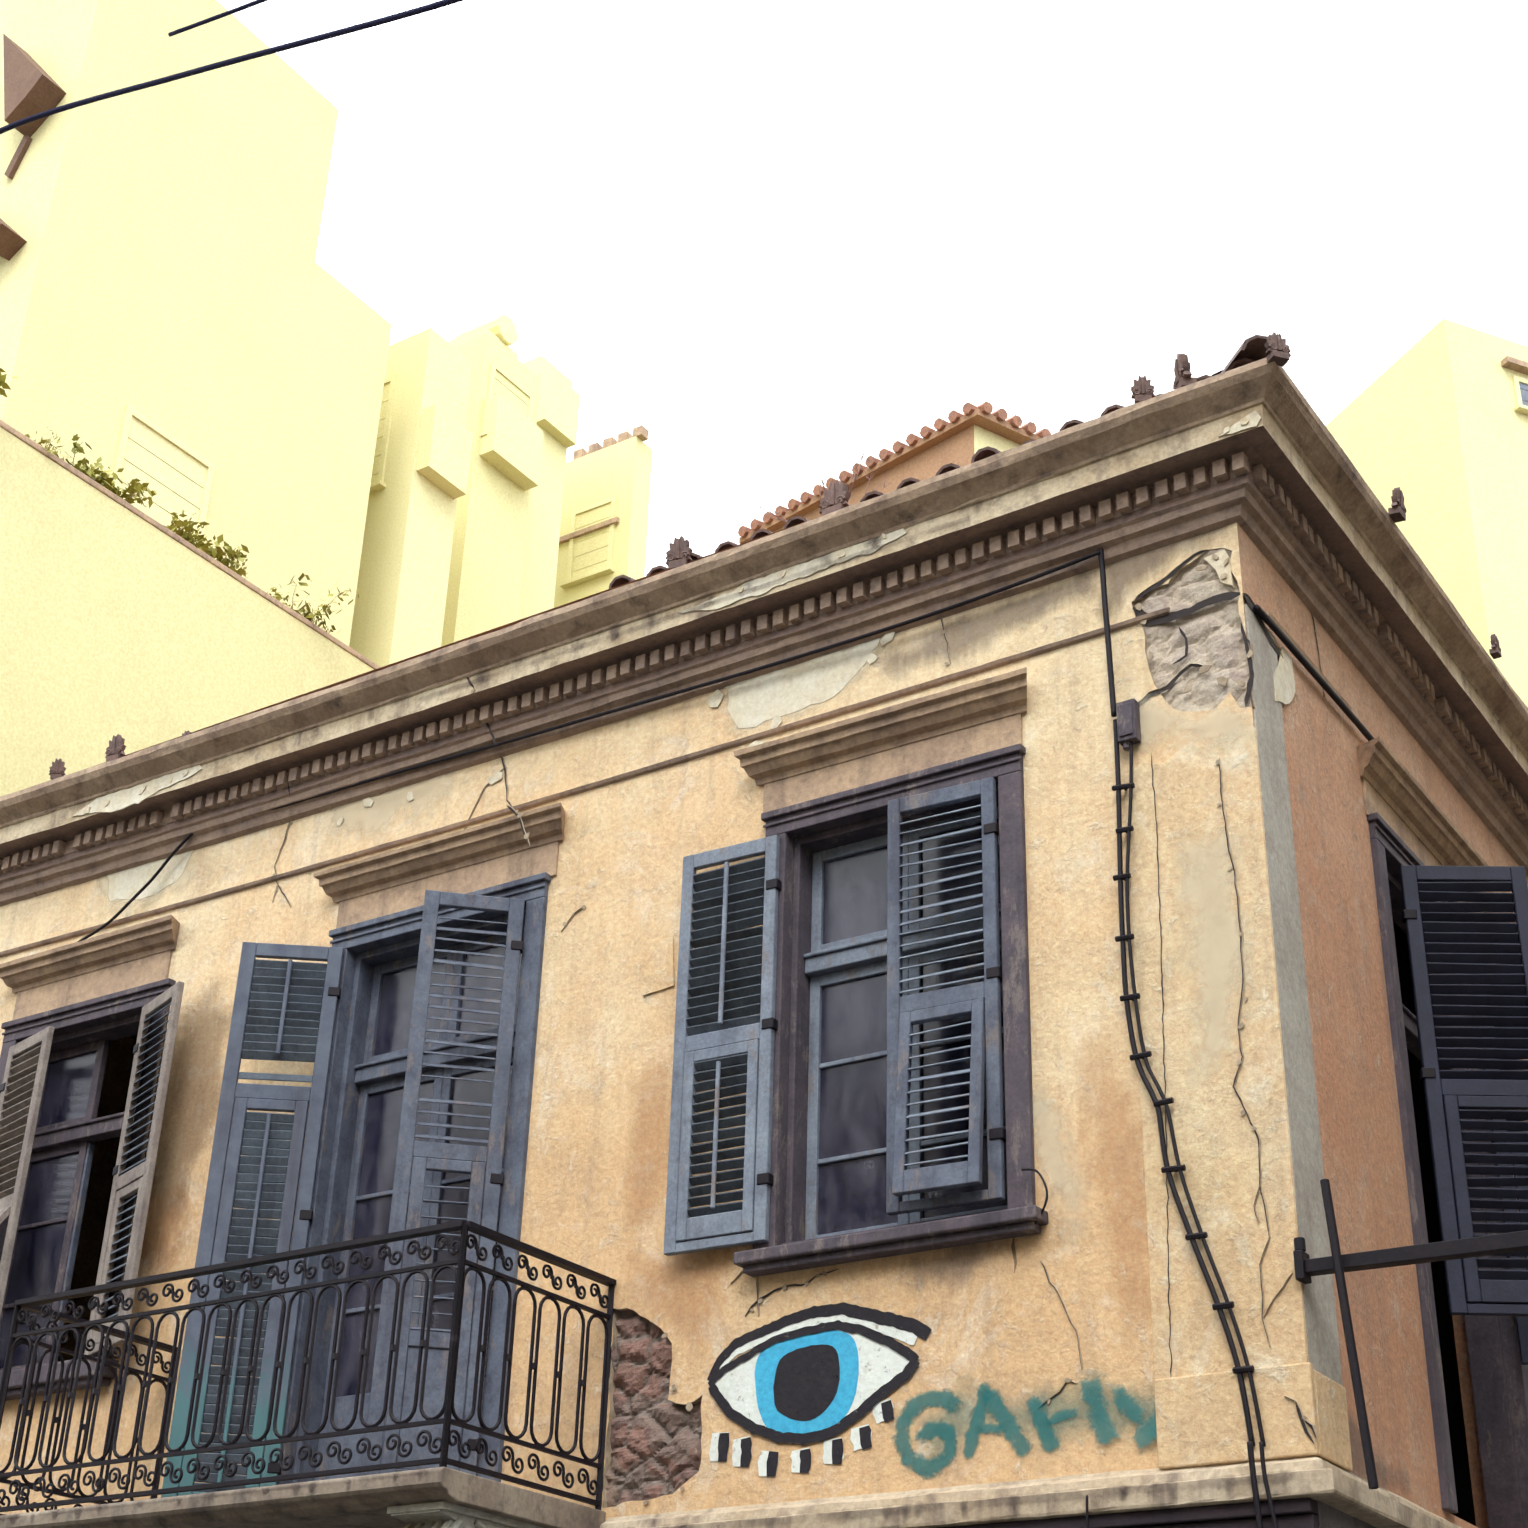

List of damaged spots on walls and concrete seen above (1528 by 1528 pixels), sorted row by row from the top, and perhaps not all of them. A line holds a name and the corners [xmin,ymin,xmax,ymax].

crack [464,676,530,846]
peeling [706,632,895,747]
spalling [1133,548,1254,739]
crack [1151,755,1172,1374]
crack [1215,758,1293,1347]
spalling [606,1310,702,1507]
crack [730,1269,838,1317]
crack [1040,1260,1083,1406]